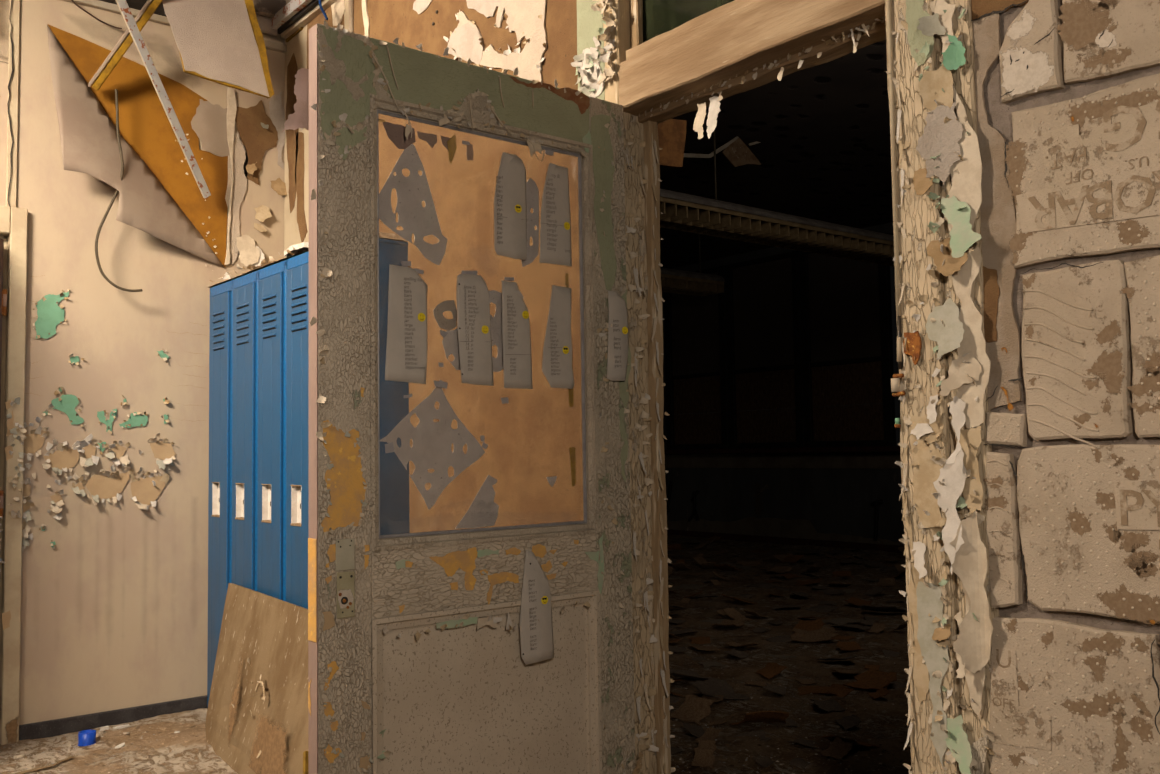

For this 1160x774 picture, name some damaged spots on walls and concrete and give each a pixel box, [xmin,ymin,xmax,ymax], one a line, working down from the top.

flaking render [413,0,438,25]
flaking render [438,0,617,114]
spalling [1095,29,1117,48]
peeling [210,0,423,283]
peeling [33,289,70,339]
peeling [0,387,176,563]
peeling [316,420,367,584]
peeling [612,134,676,774]
flaking render [639,0,1055,774]
peeling [429,547,519,630]